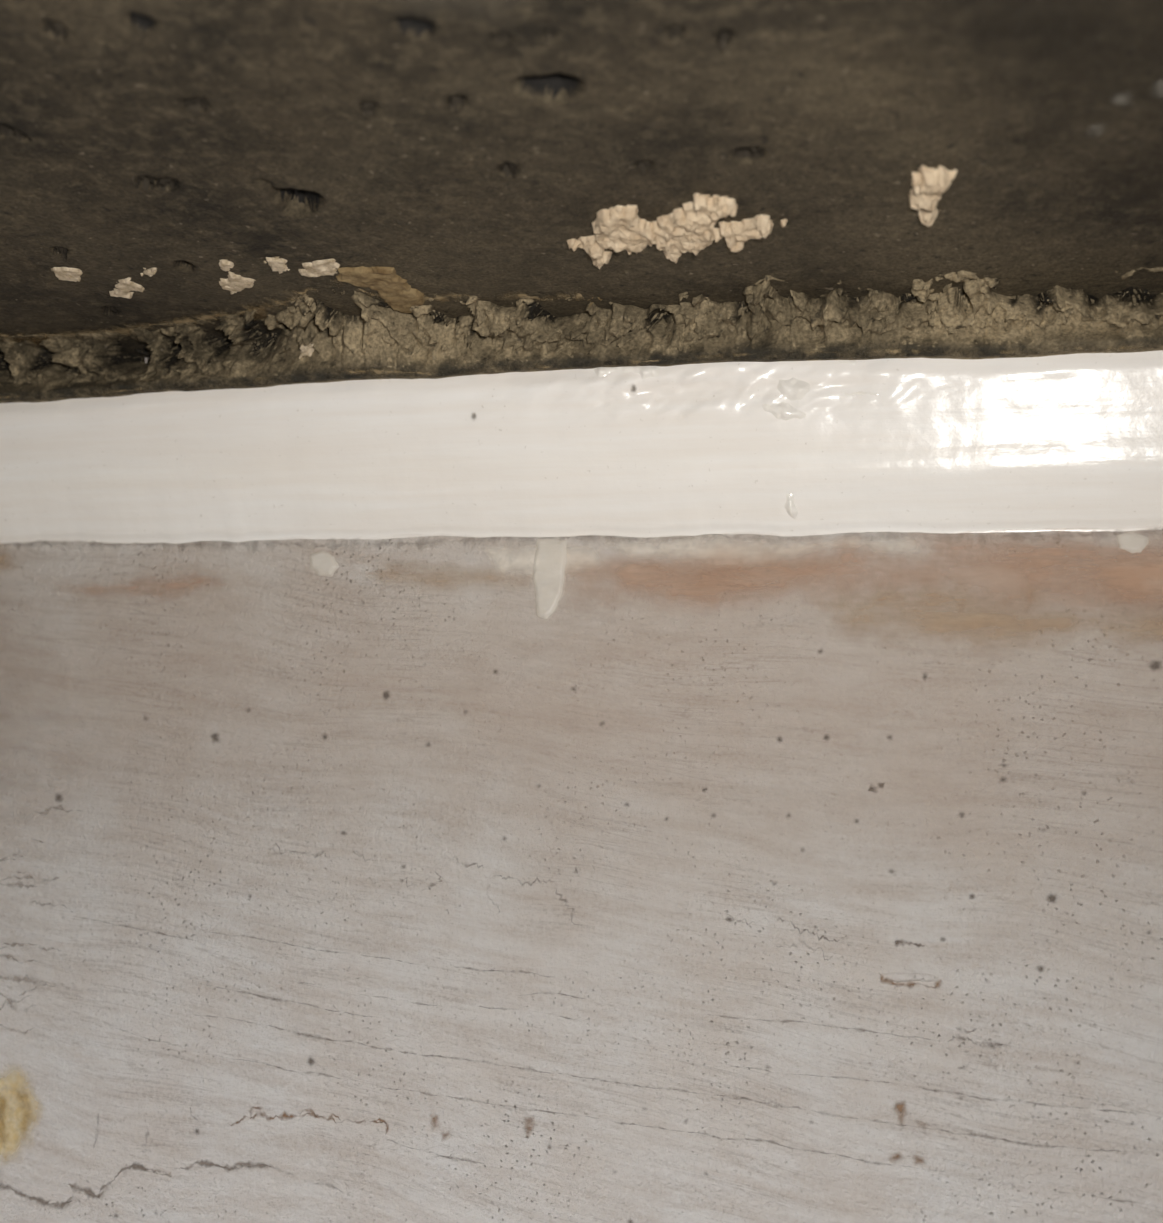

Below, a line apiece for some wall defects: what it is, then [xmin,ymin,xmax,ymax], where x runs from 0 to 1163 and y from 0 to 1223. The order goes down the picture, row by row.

peeling [591,251,613,269]
peeling [651,193,788,263]
spalling [0,267,1163,403]
rust [0,1073,37,1154]